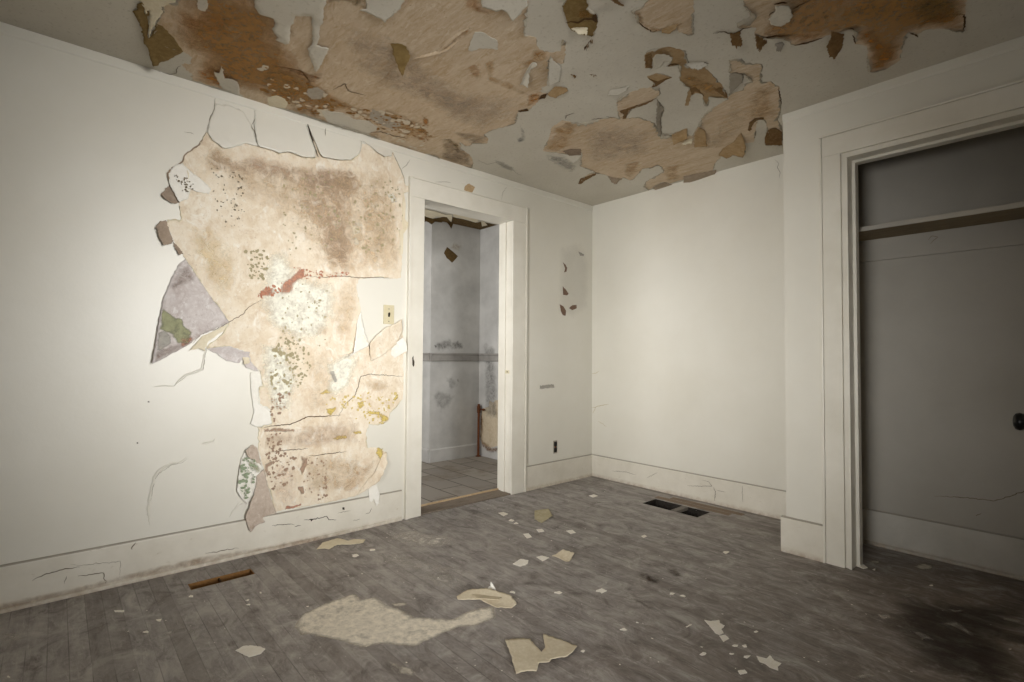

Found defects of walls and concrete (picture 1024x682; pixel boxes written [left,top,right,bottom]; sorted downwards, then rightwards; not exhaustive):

peeling [139,0,176,38]
peeling [197,0,208,11]
peeling [360,0,404,23]
peeling [481,0,528,21]
peeling [768,5,793,27]
peeling [254,0,329,72]
peeling [214,67,240,94]
peeling [267,95,288,108]
peeling [306,87,377,134]
crack [154,300,261,387]
leakage [211,159,403,509]